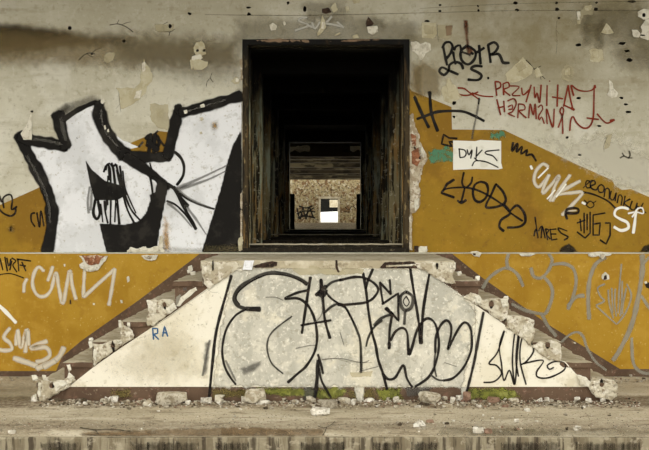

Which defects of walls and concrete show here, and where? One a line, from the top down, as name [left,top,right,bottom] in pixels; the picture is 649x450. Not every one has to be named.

damp [0,26,114,53]
peeling [190,41,208,70]
flaking render [632,9,649,40]
peeling [116,60,152,109]
flaking render [409,113,428,252]
flaking render [79,255,108,272]
spalling [380,261,456,284]
spalling [146,287,197,326]
spalling [88,320,134,366]
spalling [463,292,562,362]
spalling [31,364,76,401]
spalling [577,374,645,401]